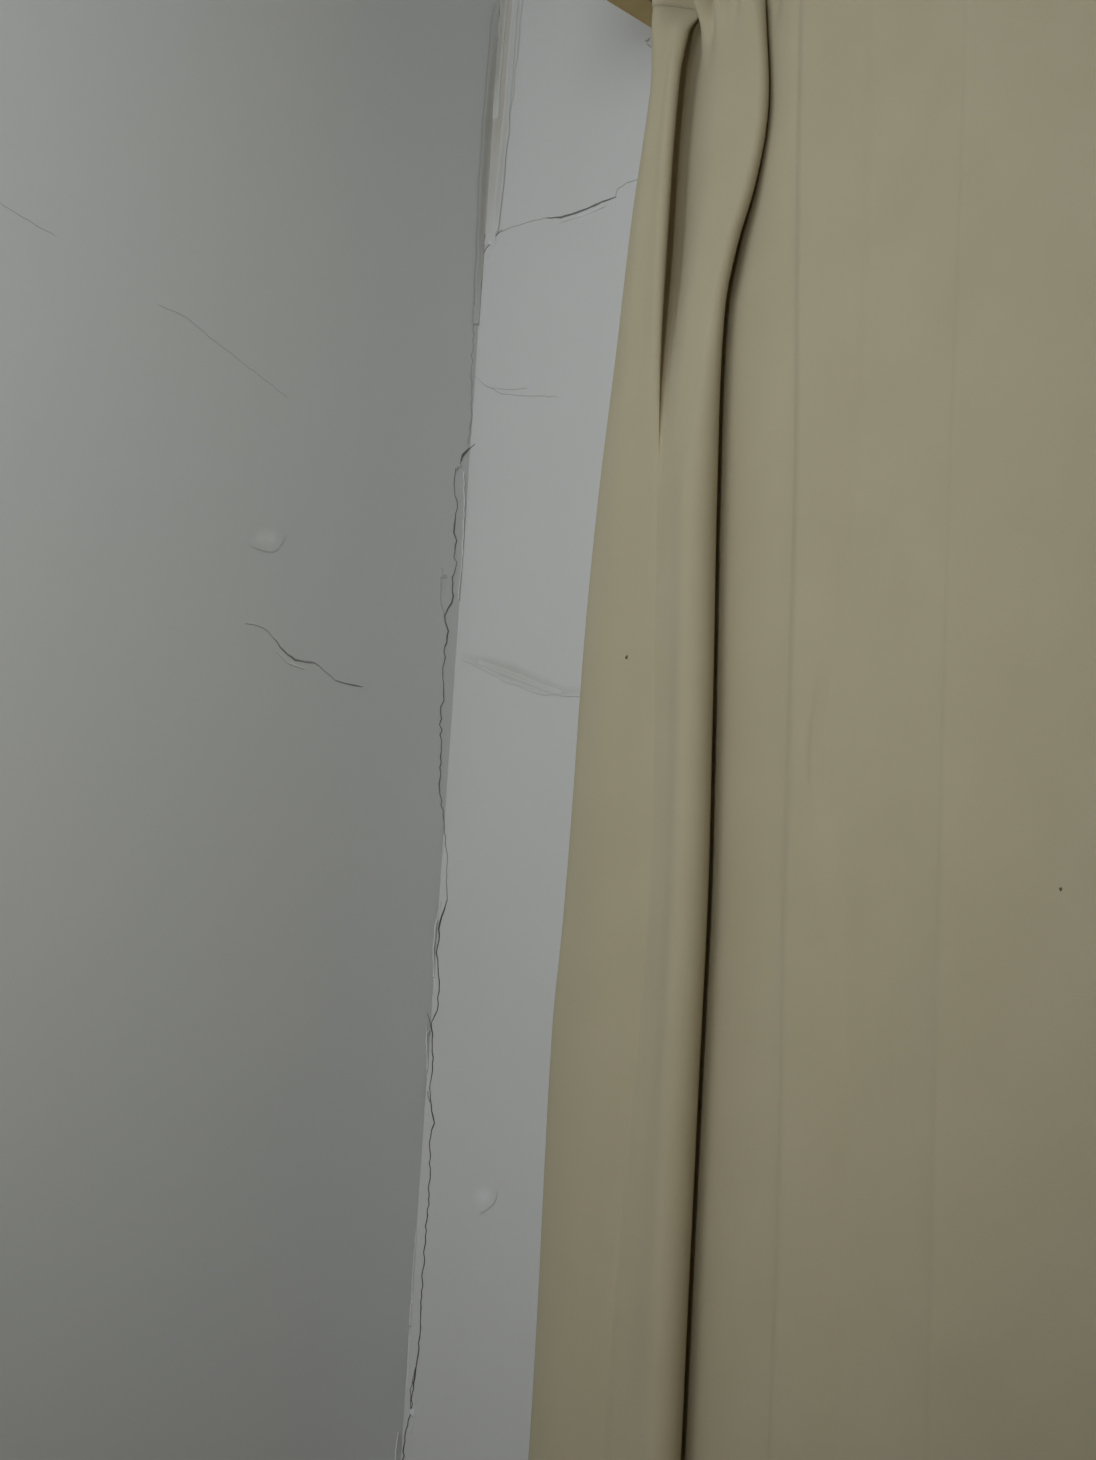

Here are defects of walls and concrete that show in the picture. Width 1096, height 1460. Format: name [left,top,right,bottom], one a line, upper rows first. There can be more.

crack [484,179,637,259]
crack [246,623,362,687]
crack [395,301,556,1460]